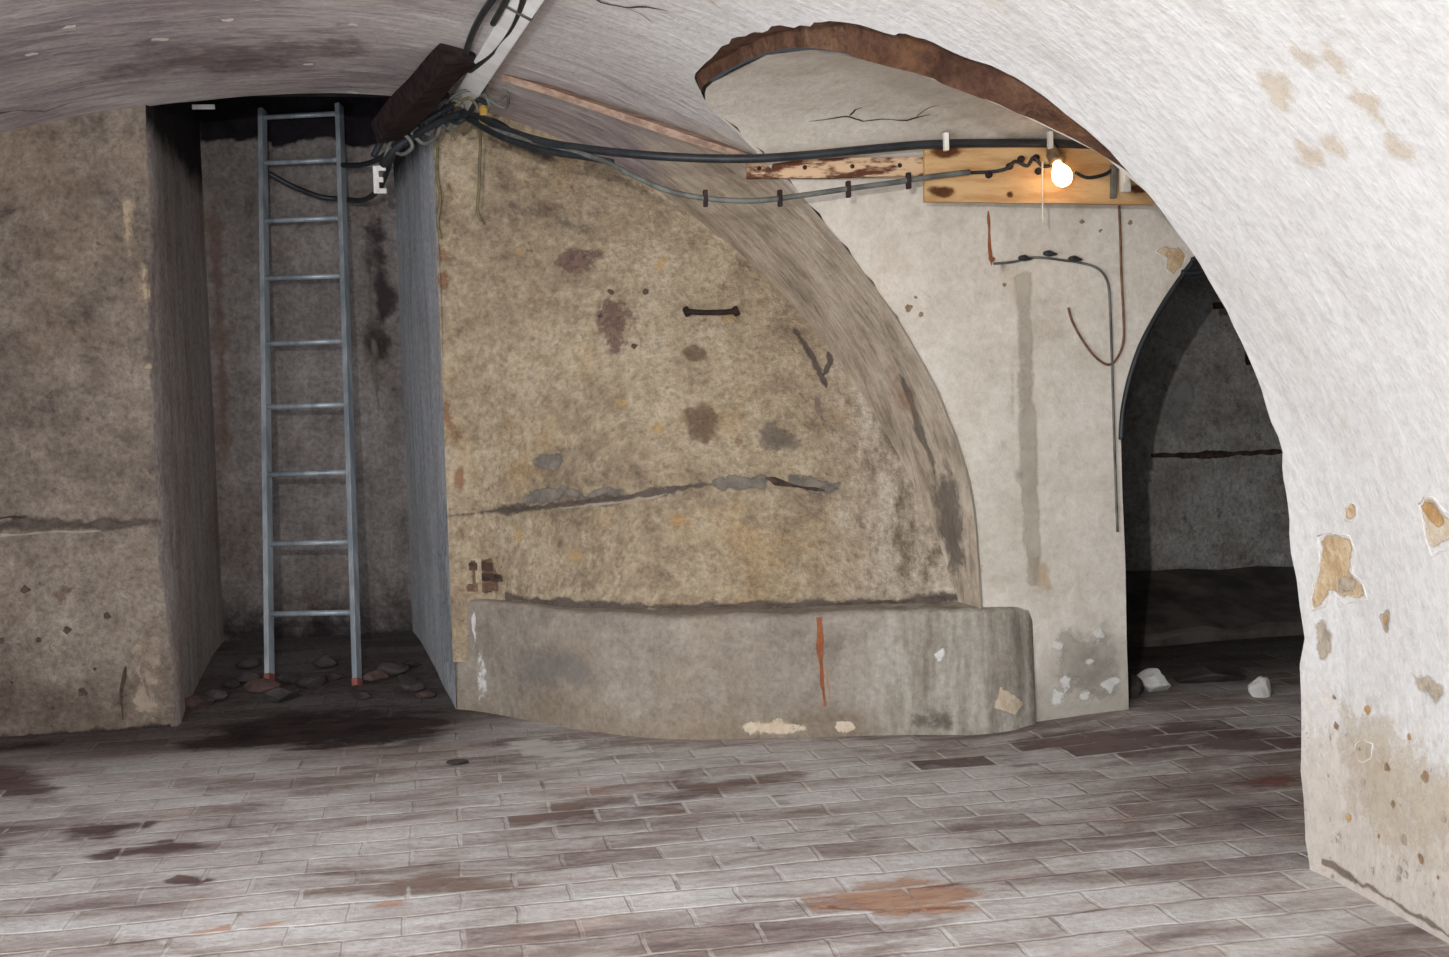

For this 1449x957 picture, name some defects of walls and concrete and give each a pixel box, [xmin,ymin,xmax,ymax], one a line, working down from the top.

crack [597,0,666,23]
crack [766,477,825,492]
crack [462,483,706,515]
crack [0,516,158,532]
peeling [1418,495,1449,557]
peeling [1309,502,1368,659]
peeling [1379,610,1390,632]
rust [816,617,830,706]
spalling [743,718,806,735]
spalling [835,721,856,733]